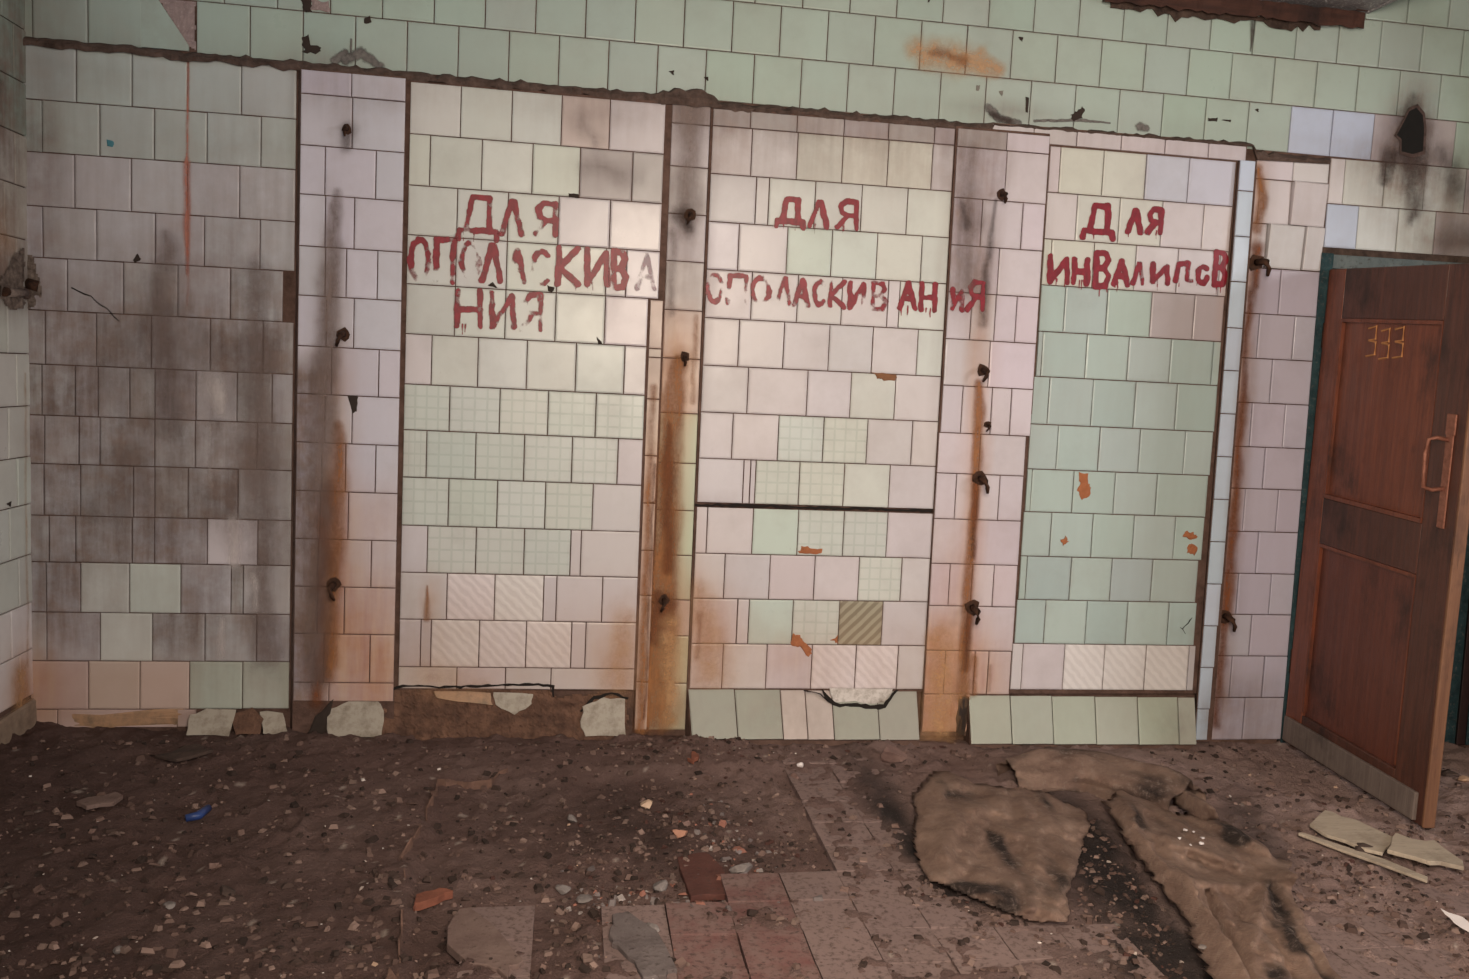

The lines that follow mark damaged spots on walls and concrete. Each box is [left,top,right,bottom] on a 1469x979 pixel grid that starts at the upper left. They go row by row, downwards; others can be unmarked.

spalling [160,0,196,50]
corrosion [312,423,344,703]
corrosion [637,356,685,732]
corrosion [933,381,984,734]